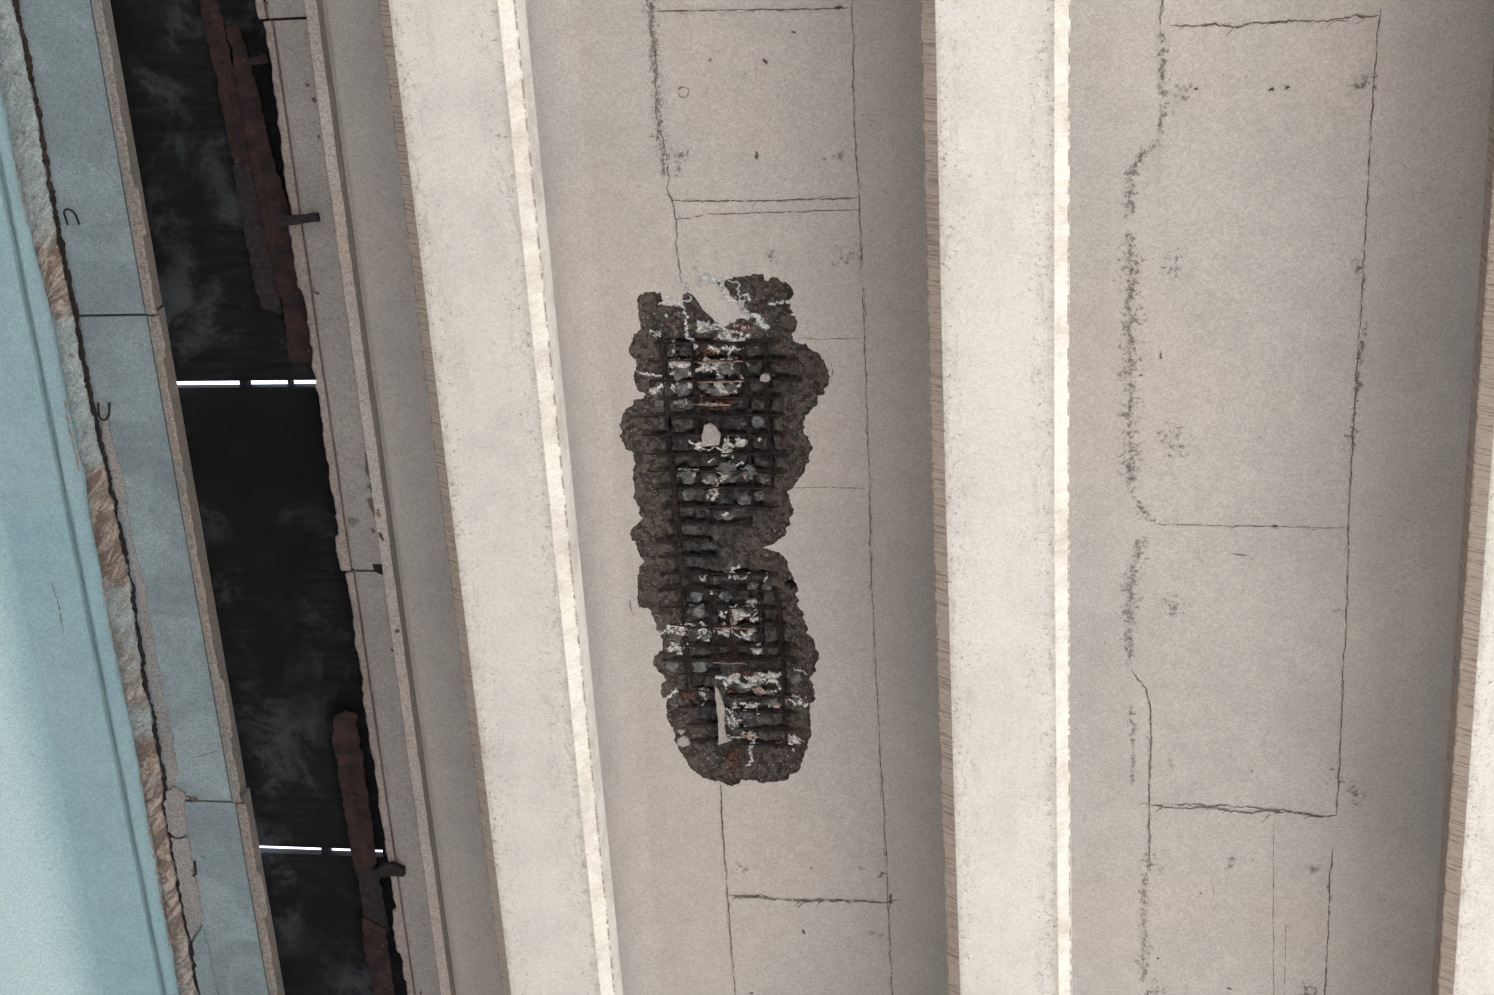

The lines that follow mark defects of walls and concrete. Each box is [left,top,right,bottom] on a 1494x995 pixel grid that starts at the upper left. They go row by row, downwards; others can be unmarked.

crack [12,0,216,995]
spalling [619,273,830,786]
crack [646,0,899,995]
crack [1132,0,1381,995]